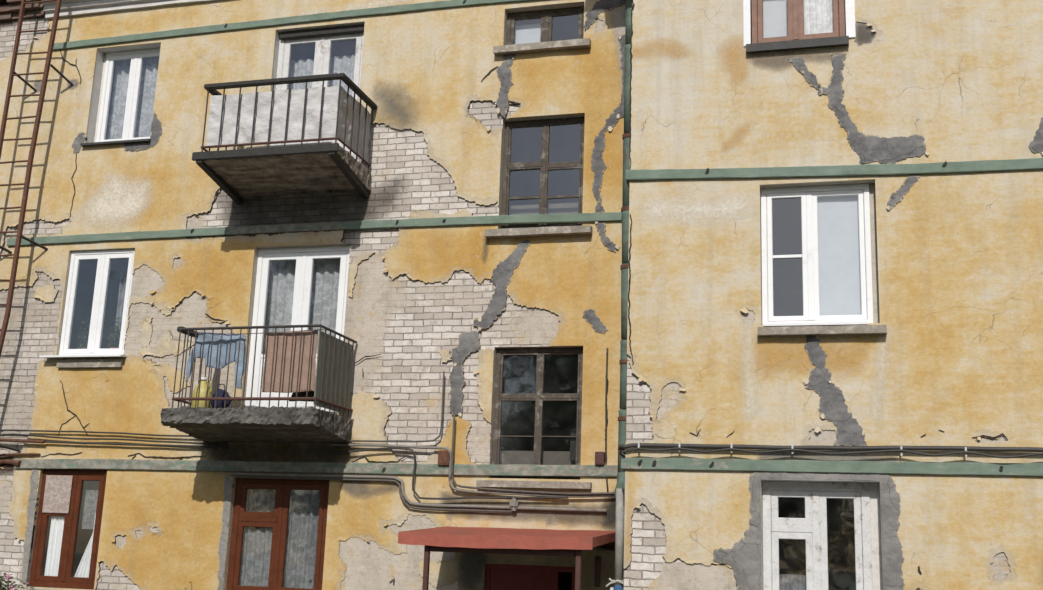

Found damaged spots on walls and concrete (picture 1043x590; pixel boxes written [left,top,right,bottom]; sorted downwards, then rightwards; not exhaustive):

crack [481,54,520,119]
crack [584,0,635,365]
crack [789,53,929,211]
crack [1029,117,1043,156]
flaking render [0,271,63,590]
flaking render [124,264,235,408]
flaking render [187,121,560,464]
crack [449,239,530,417]
flaking render [626,354,686,443]
crack [803,335,867,446]
flaking render [339,537,459,590]
flaking render [624,503,737,590]